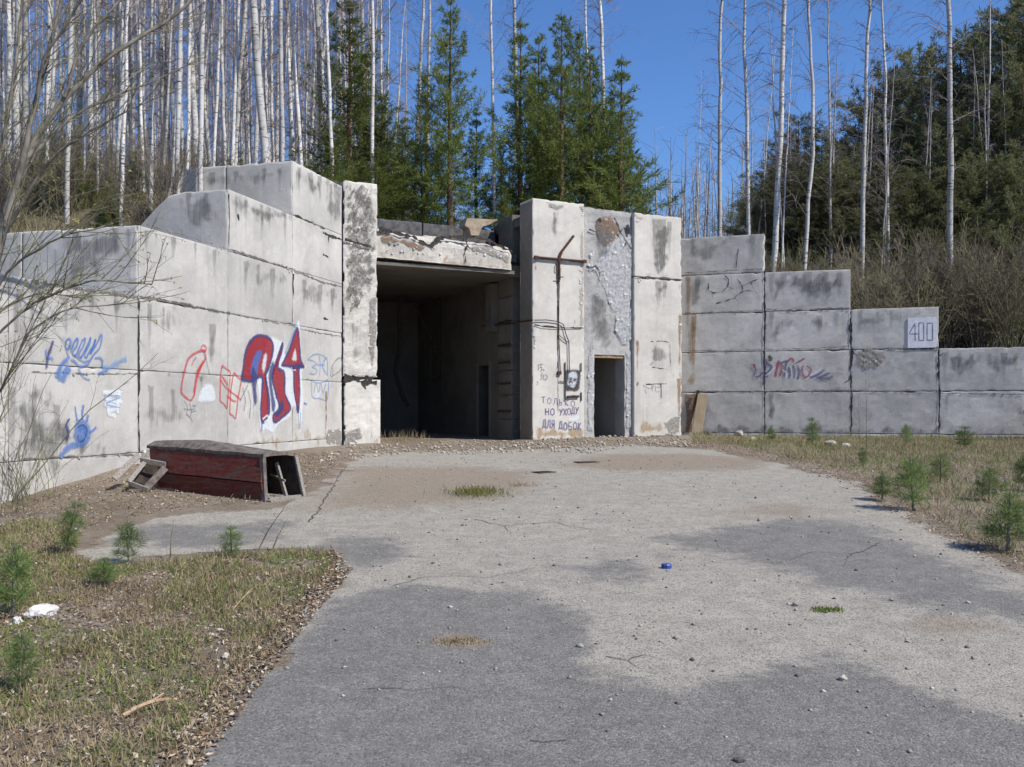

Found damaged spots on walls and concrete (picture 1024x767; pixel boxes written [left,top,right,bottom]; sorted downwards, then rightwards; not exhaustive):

spalling [346,184,425,364]
corrosion [534,255,587,286]
flaking render [579,216,642,428]
damp [655,227,667,272]
crack [708,252,769,432]
spalling [857,347,896,369]